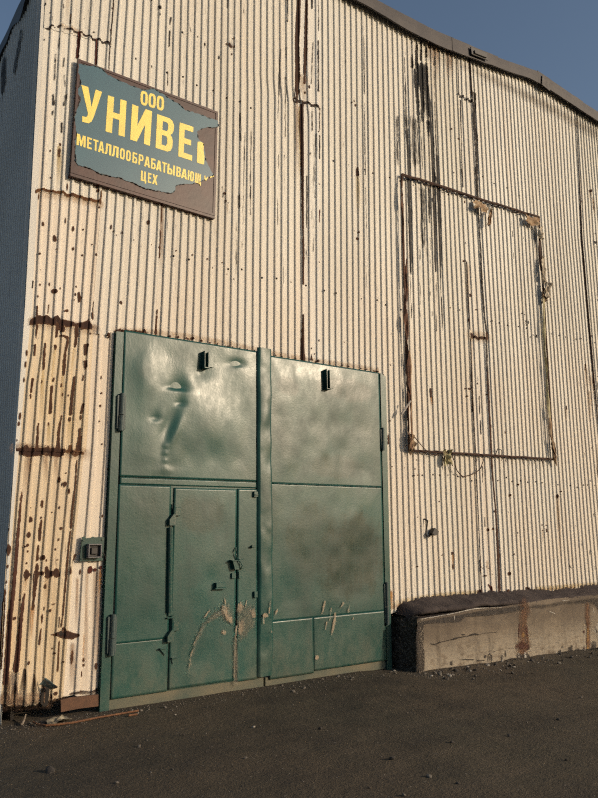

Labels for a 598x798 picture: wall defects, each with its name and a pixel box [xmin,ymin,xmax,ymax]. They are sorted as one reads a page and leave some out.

corrosion [293,75,310,140]
corrosion [16,283,95,467]
corrosion [0,482,103,708]
corrosion [516,601,530,658]